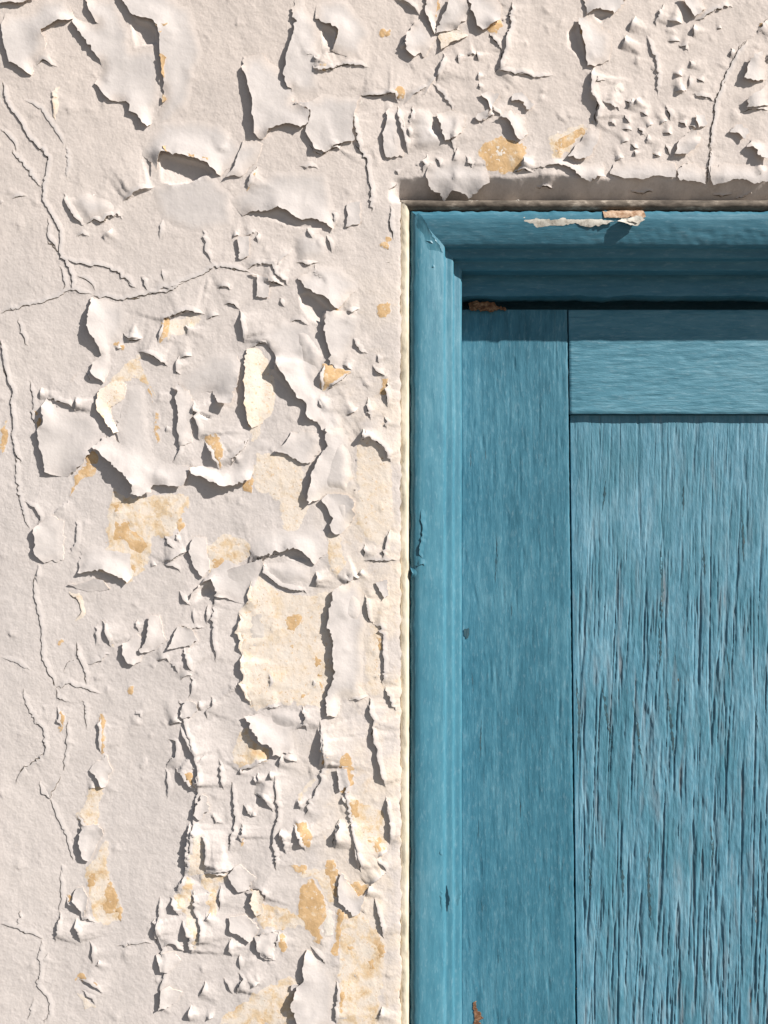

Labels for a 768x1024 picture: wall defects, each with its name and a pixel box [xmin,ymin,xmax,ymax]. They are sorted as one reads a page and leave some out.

peeling [514,0,768,199]
peeling [524,210,646,228]
peeling [0,0,553,1011]
crack [0,576,101,912]
crack [0,911,55,1024]
crack [117,938,152,947]
peeling [188,981,209,1021]
peeling [290,945,341,1024]